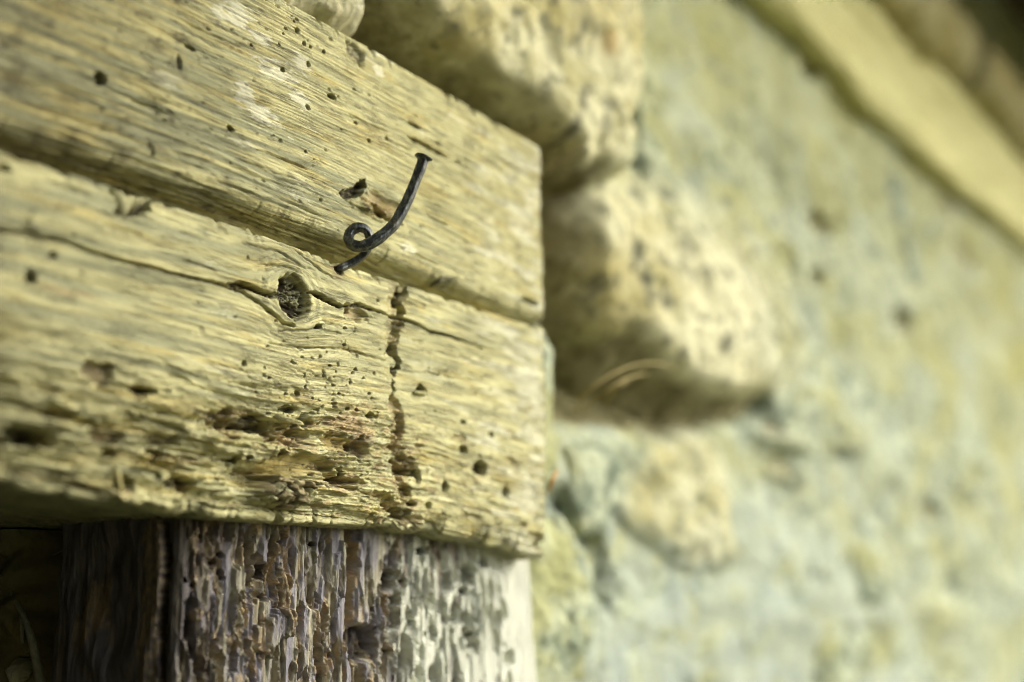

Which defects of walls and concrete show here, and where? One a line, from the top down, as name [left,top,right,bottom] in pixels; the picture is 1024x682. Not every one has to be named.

crack [303,290,484,350]
crack [326,466,346,483]